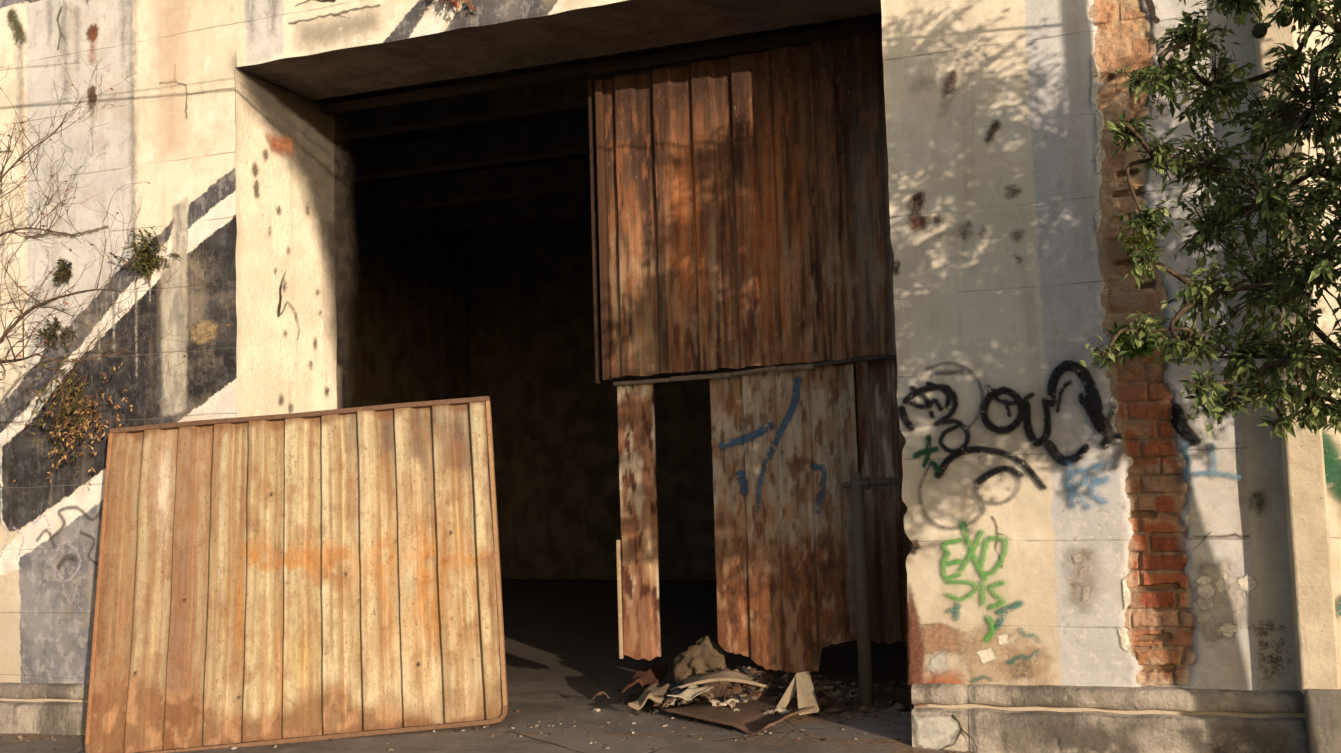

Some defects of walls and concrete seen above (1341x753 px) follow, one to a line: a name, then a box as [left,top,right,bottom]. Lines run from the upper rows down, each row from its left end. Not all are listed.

crack [289,0,380,24]
spalling [1088,0,1292,686]
peeling [959,629,1052,686]
crack [940,715,977,750]